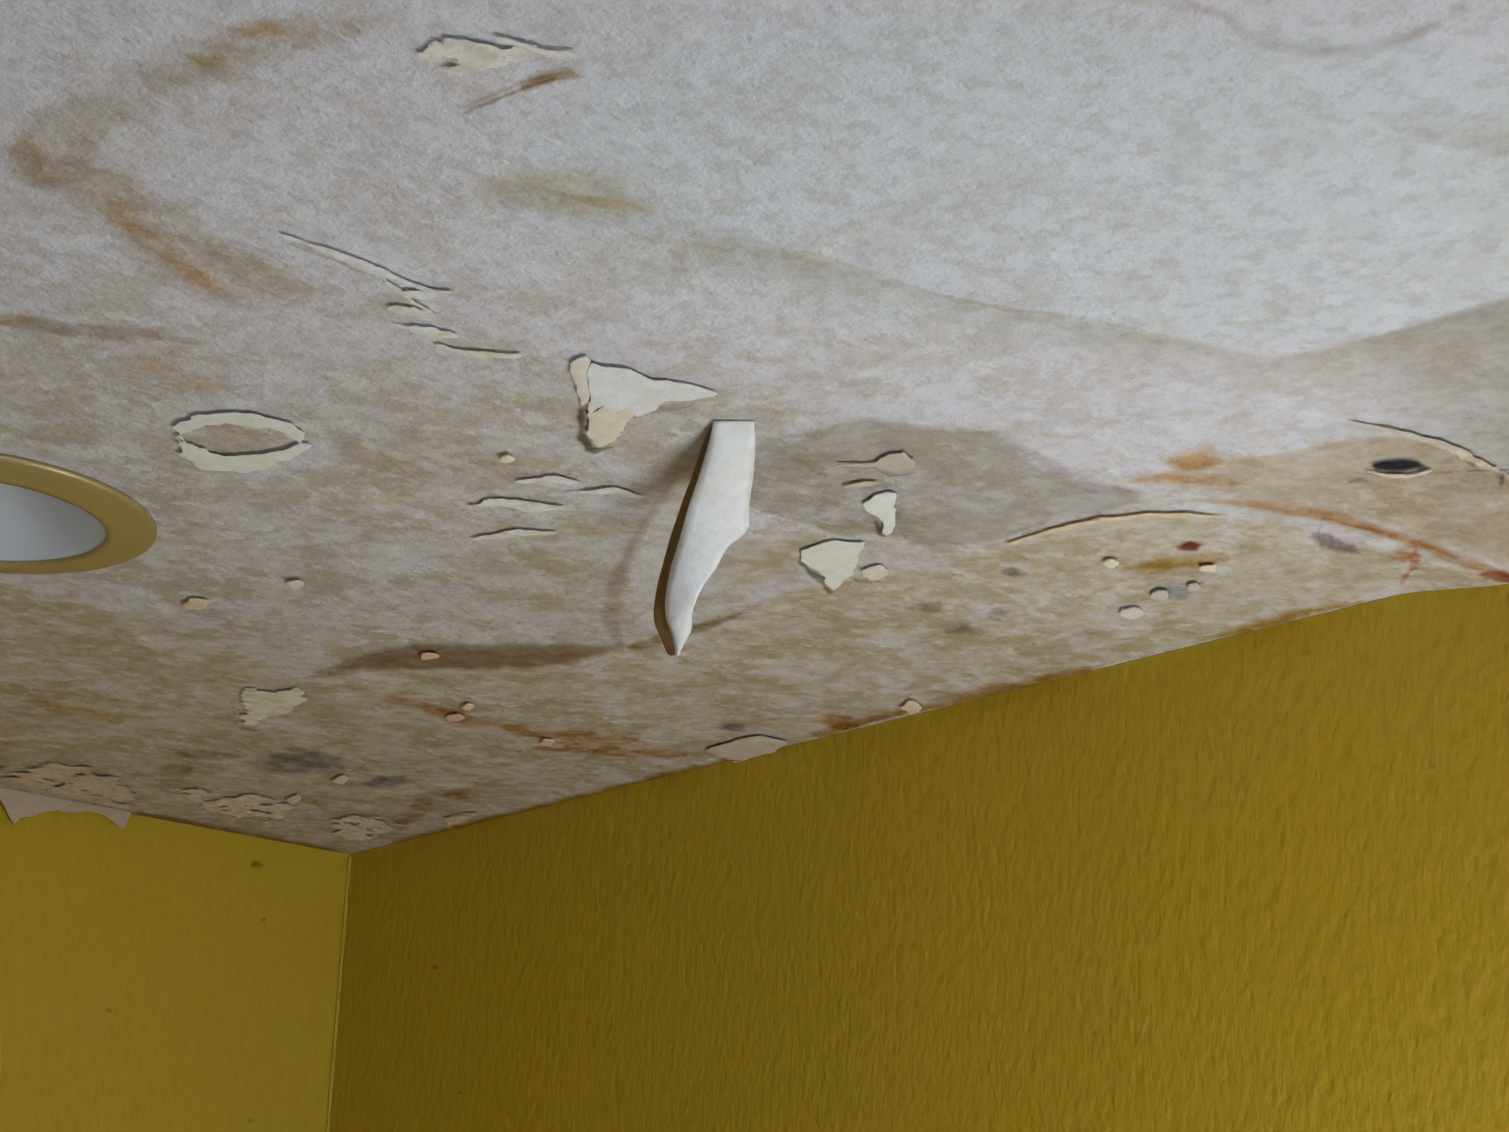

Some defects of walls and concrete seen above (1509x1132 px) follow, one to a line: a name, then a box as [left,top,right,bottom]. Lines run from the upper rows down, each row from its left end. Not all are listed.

peeling [414,37,577,77]
peeling [570,356,718,453]
peeling [838,452,916,535]
peeling [654,420,755,657]
peeling [800,540,888,590]
peeling [239,686,308,727]
peeling [0,761,138,829]